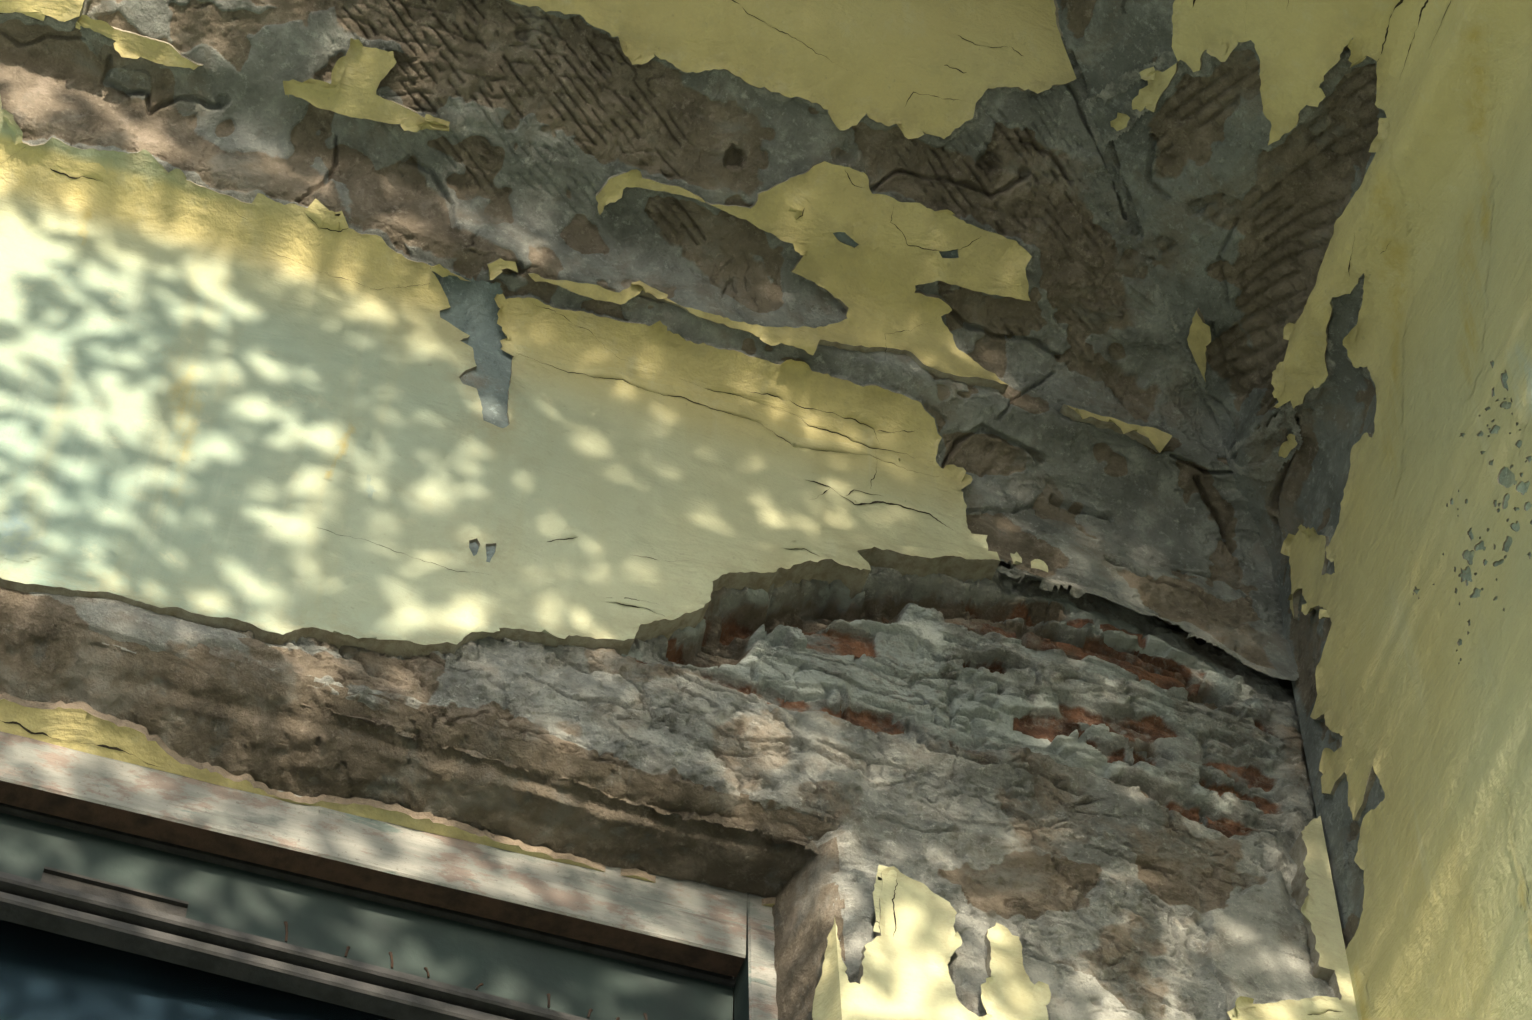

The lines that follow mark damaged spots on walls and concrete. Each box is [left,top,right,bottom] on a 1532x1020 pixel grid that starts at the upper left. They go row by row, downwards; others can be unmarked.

crack [0,0,48,22]
crack [732,0,852,72]
crack [1367,0,1403,62]
flaking render [0,0,1389,681]
crack [513,302,960,530]
peeling [1456,361,1532,601]
crack [541,527,577,542]
crack [783,540,826,556]
crack [606,593,673,617]
flaking render [1233,273,1385,950]
crack [2,721,158,767]
flaking render [0,565,1335,1020]